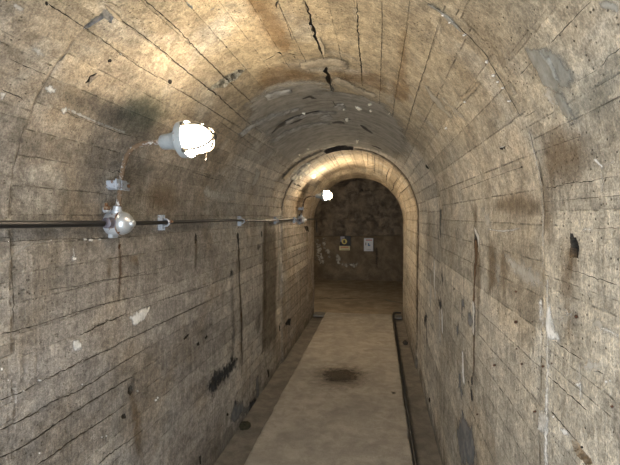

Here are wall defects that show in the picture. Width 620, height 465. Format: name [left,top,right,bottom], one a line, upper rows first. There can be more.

crack [305,2,340,93]
leakage [323,369,359,382]